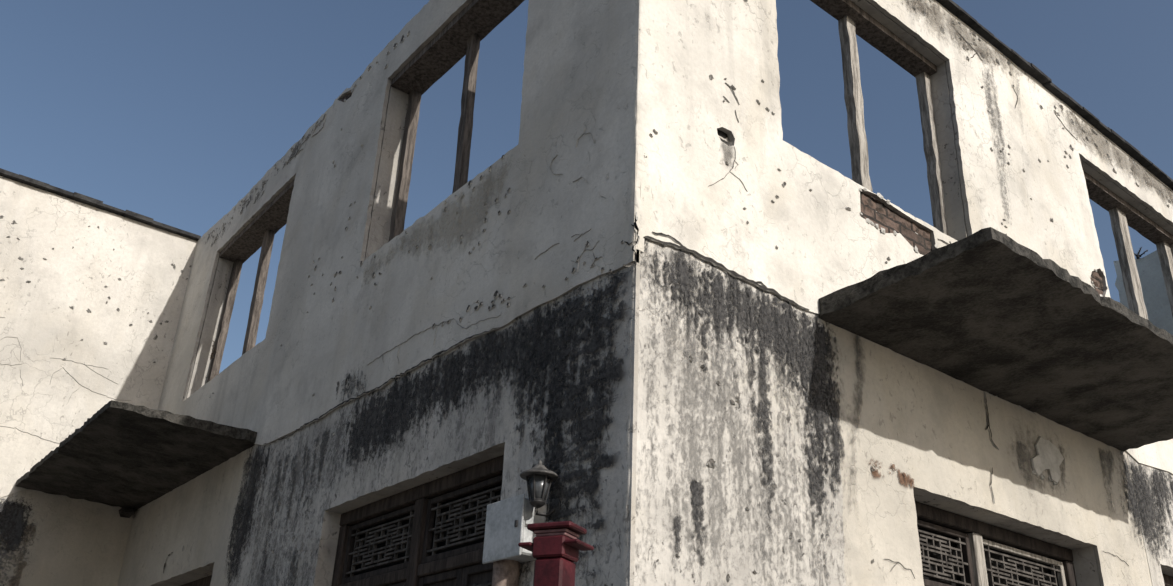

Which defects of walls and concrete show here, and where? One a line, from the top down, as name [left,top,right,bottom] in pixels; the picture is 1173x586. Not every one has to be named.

crack [550,127,607,199]
crack [709,82,748,192]
crack [534,212,809,323]
flaking render [845,188,938,255]
crack [0,317,131,405]
damp [336,271,626,579]
damp [645,249,845,563]
damp [0,498,36,586]
damp [1100,451,1173,563]